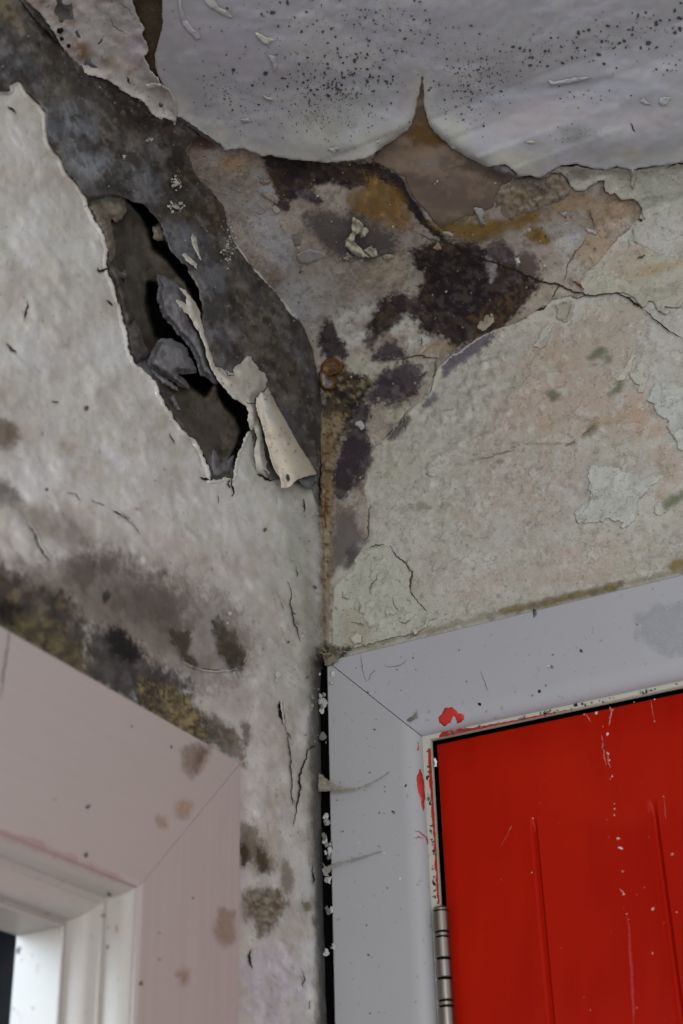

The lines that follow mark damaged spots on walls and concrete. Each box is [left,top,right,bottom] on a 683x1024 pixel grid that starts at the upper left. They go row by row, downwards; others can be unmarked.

peeling [0,0,683,579]
damp [193,0,683,499]
crack [418,212,683,339]
corrosion [318,414,345,645]
crack [363,504,426,624]
damp [0,562,198,705]
damp [211,615,245,672]
damp [184,711,250,773]
crack [278,701,314,824]
damp [240,826,294,936]